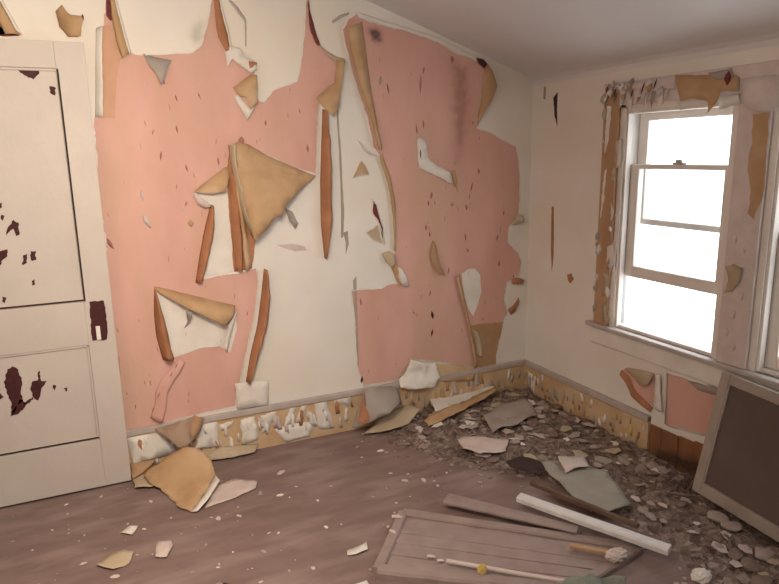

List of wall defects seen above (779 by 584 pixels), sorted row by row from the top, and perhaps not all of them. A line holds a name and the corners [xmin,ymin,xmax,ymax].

peeling [18,70,39,79]
peeling [675,68,741,114]
peeling [748,113,770,219]
peeling [0,203,20,236]
peeling [89,0,645,465]
peeling [0,366,67,417]
peeling [664,370,718,436]